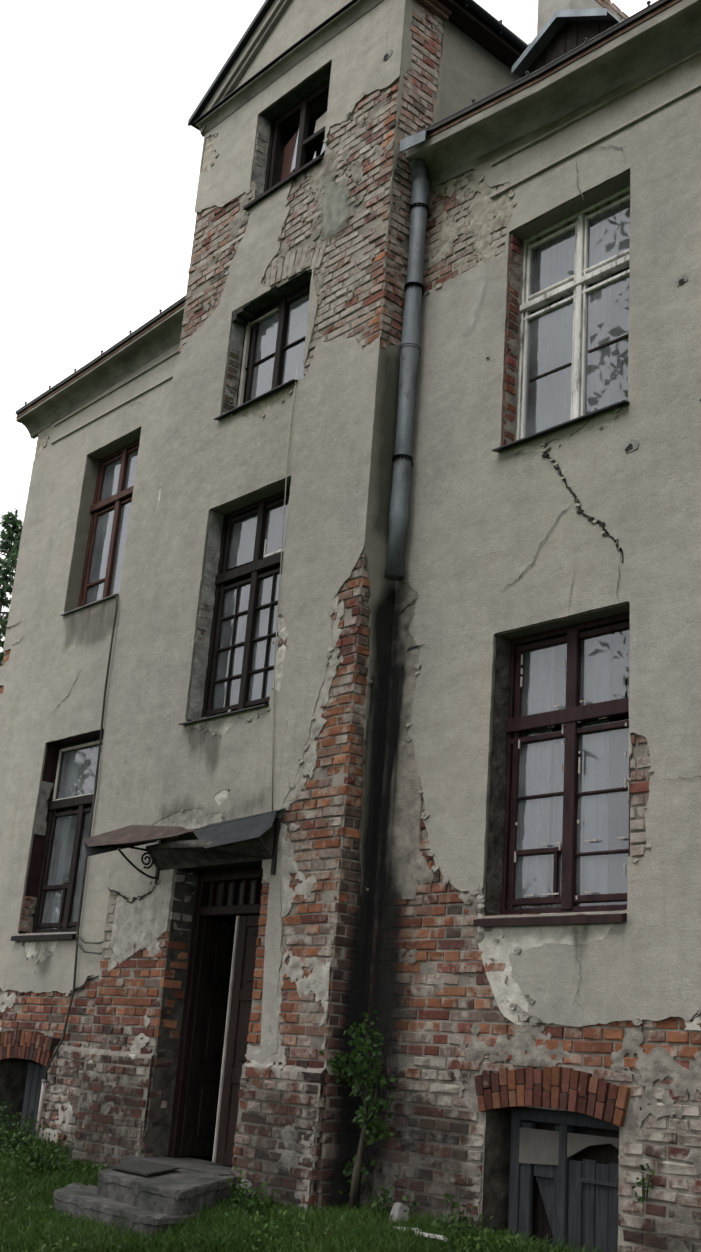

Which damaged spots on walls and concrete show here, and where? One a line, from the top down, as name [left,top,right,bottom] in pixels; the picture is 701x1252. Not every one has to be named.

flaking render [178,132,267,357]
flaking render [221,0,444,418]
flaking render [422,170,621,458]
crack [500,438,622,597]
flaking render [0,869,194,1169]
flaking render [230,553,373,1212]
leakage [328,587,404,1211]
flaking render [359,581,701,1252]